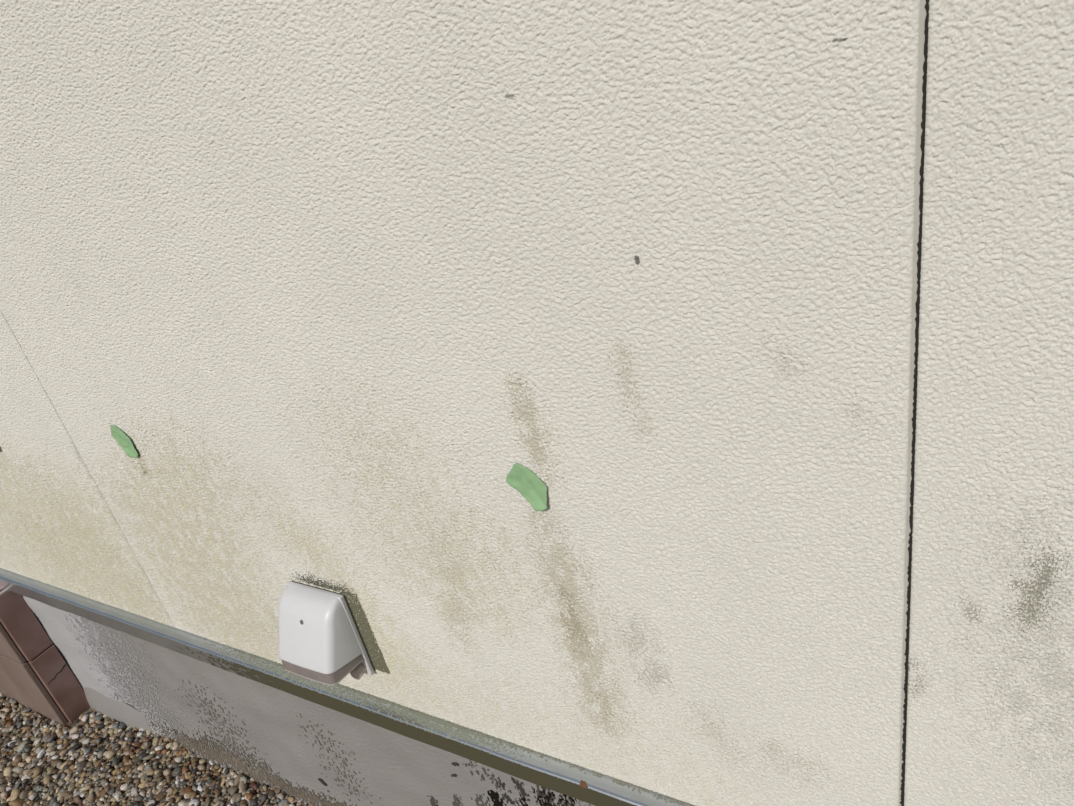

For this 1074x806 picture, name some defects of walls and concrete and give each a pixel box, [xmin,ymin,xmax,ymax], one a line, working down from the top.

mould [999,529,1074,647]
leakage [452,760,590,806]